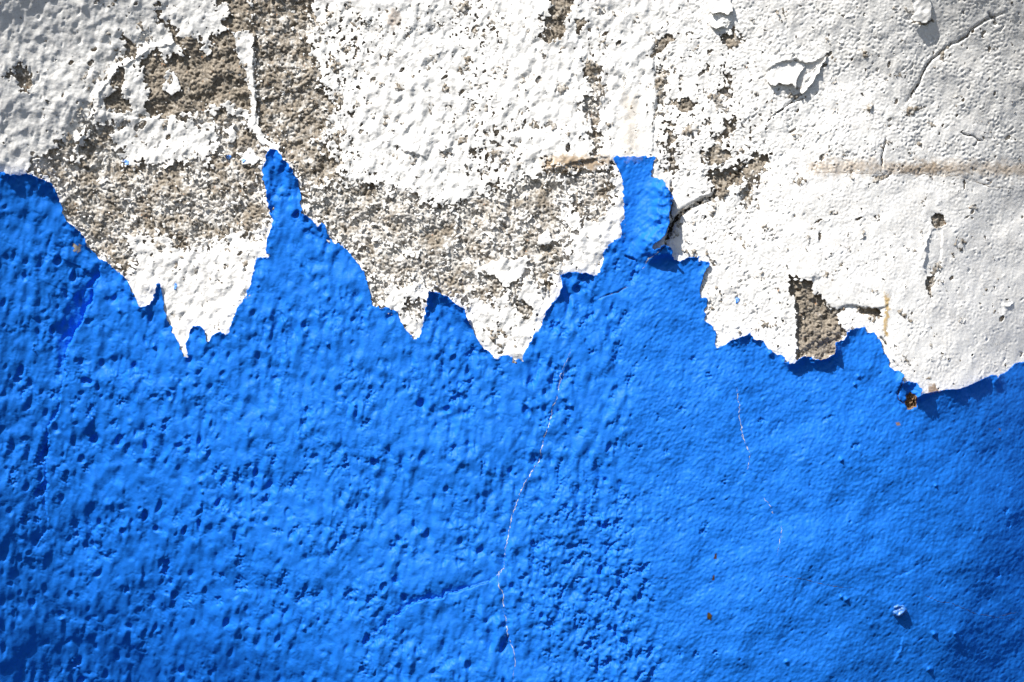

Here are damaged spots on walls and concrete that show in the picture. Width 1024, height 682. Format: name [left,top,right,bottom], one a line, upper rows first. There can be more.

spalling [0,0,1024,410]
crack [597,163,746,300]
crack [907,12,1004,100]
crack [365,349,571,680]